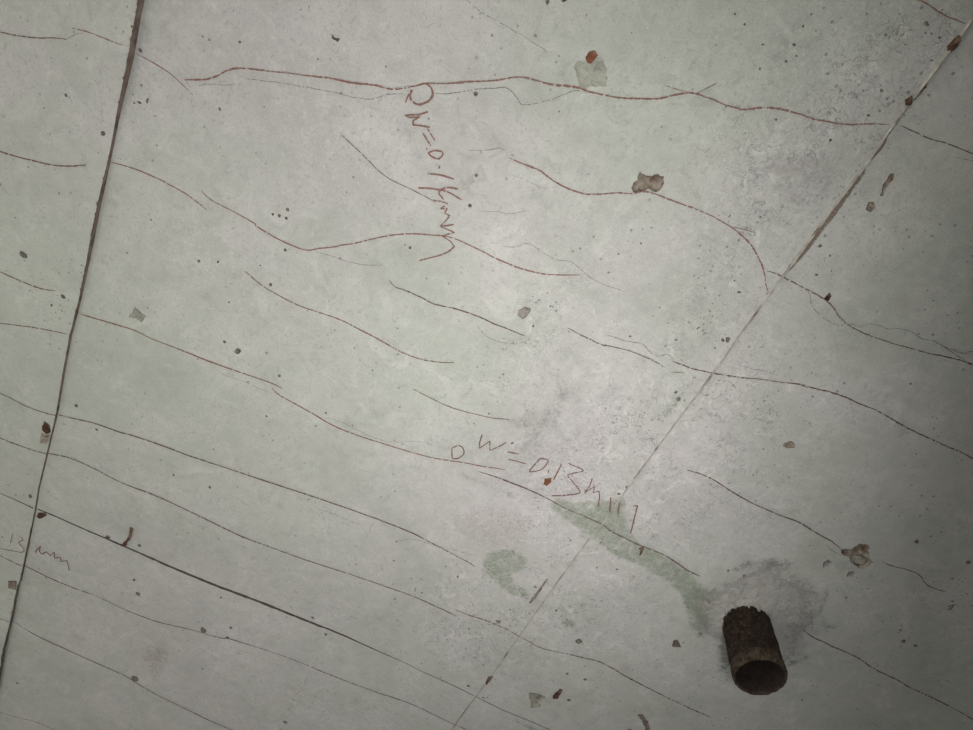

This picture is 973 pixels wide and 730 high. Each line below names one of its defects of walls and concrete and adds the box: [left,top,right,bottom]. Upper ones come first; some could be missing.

crack [918,0,973,30]
crack [1,28,973,161]
crack [0,151,85,167]
crack [342,135,433,201]
spalling [631,171,664,193]
crack [111,162,624,292]
crack [469,148,973,365]
crack [246,271,454,363]
crack [389,280,526,344]
crack [568,328,973,459]
crack [687,470,842,556]
spalling [841,544,872,577]